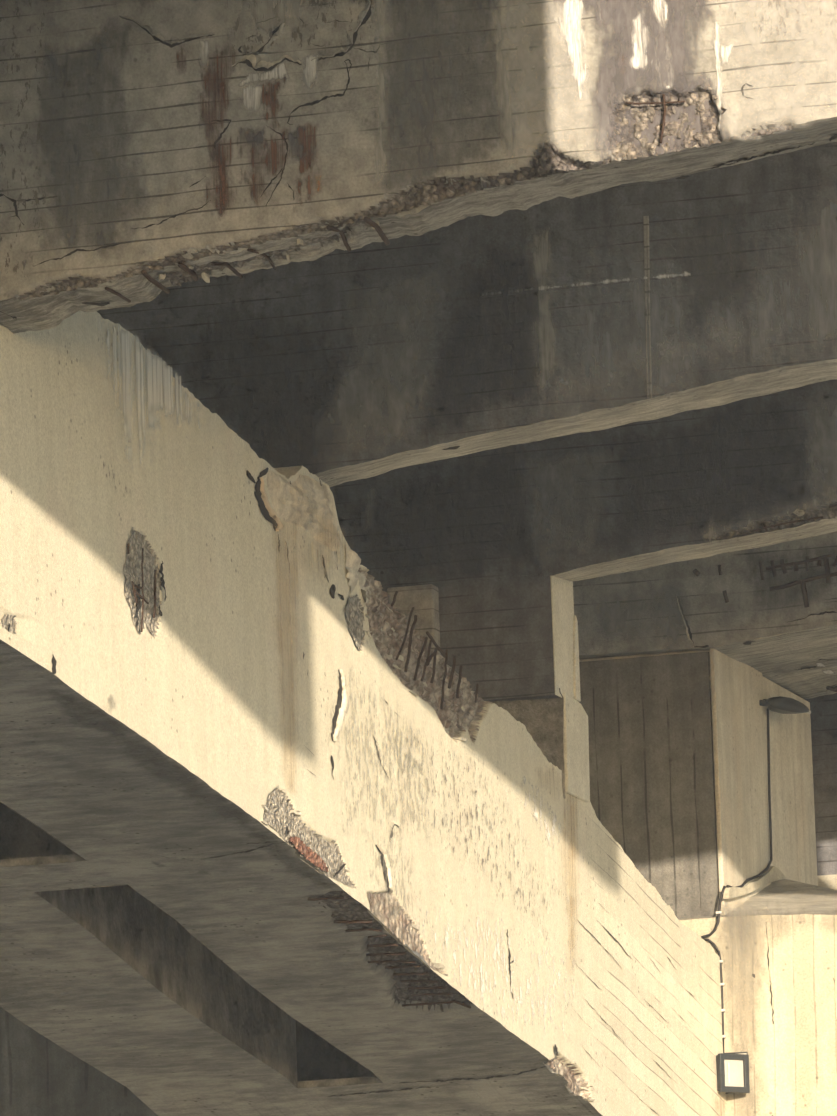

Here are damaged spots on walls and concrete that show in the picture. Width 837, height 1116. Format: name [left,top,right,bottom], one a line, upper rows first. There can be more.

crack [119,15,215,48]
rust [200,50,320,215]
crack [232,0,388,206]
spalling [14,85,792,303]
water stain [554,0,733,158]
spalling [123,527,166,638]
crack [247,467,322,568]
crack [322,551,344,600]
spalling [344,567,492,741]
spalling [711,504,837,539]
spalling [759,554,837,607]
spalling [260,778,574,1027]